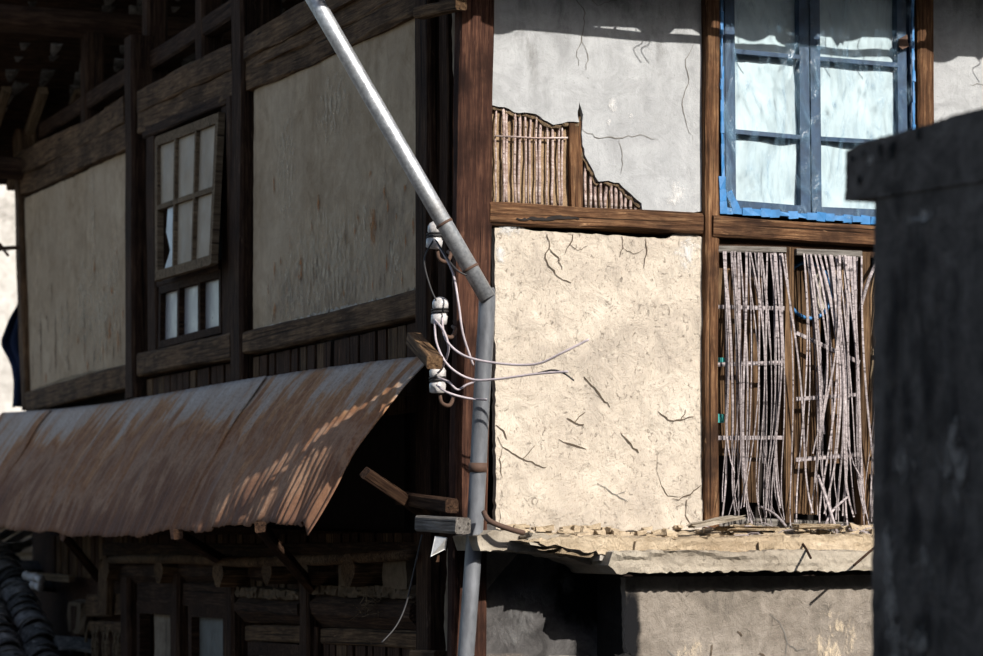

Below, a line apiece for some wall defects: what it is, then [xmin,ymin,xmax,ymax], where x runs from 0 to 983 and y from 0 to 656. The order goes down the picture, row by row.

crack [576,0,616,66]
crack [682,44,694,136]
flaking render [492,106,640,209]
crack [583,130,651,171]
crack [545,235,586,283]
crack [559,377,610,449]
crack [658,409,693,421]
crack [496,425,546,475]